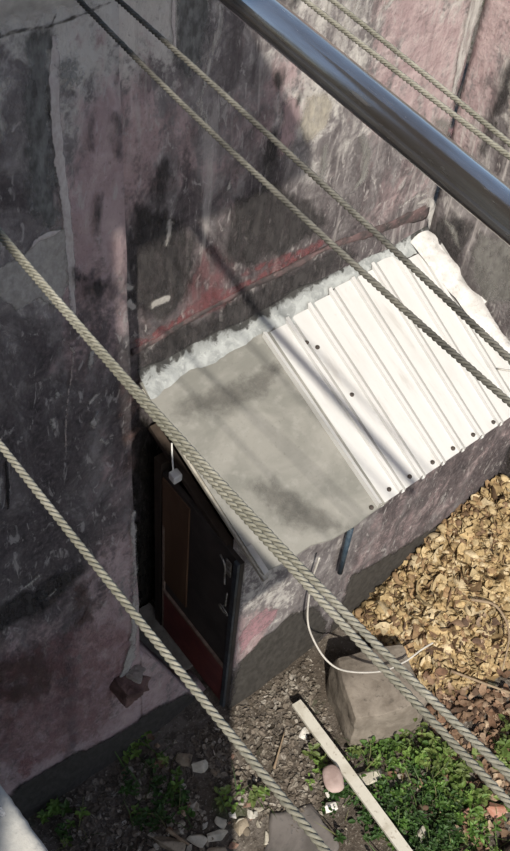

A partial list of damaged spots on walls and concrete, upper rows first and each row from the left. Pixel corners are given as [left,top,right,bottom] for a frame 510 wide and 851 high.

crack [0,9,95,38]
water stain [480,65,510,154]
water stain [129,159,195,321]